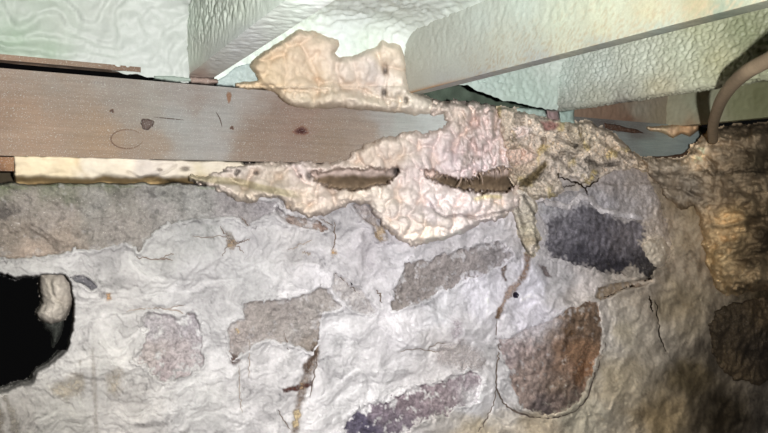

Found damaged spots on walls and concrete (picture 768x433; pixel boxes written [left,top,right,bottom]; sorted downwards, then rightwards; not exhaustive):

crack [558,177,599,194]
crack [604,278,666,351]